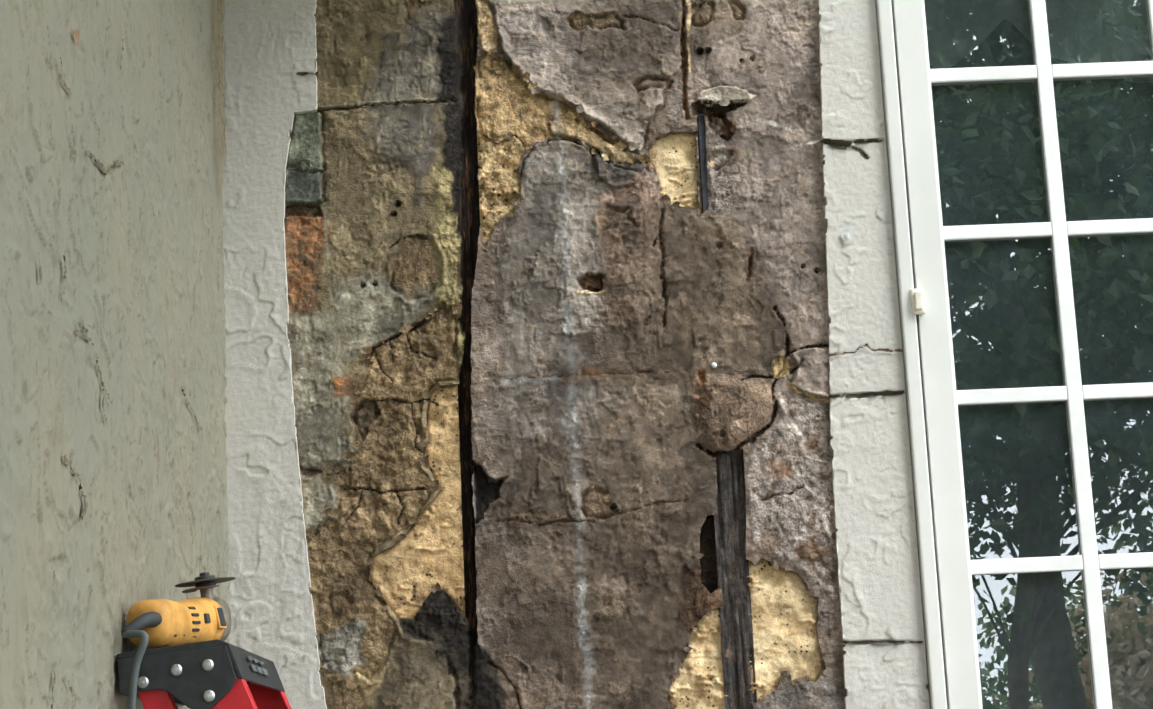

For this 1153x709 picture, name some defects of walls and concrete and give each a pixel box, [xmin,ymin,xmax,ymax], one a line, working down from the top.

peeling [474,0,712,188]
peeling [691,83,756,141]
crack [820,138,883,159]
spalling [285,202,321,218]
spalling [594,204,639,235]
peeling [659,194,680,209]
spalling [578,272,609,292]
crack [695,312,904,458]
peeling [776,348,833,398]
spalling [300,302,462,675]
spalling [471,461,507,523]
spalling [695,511,717,593]